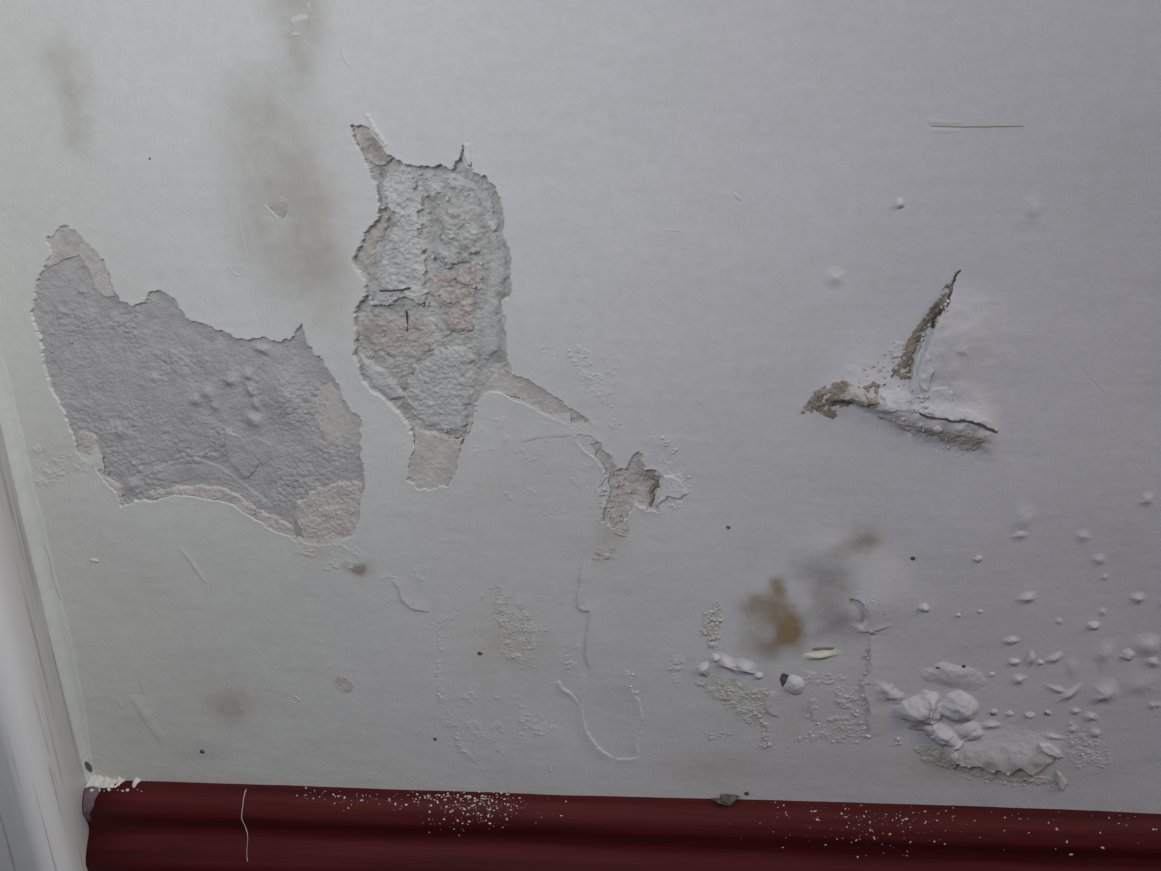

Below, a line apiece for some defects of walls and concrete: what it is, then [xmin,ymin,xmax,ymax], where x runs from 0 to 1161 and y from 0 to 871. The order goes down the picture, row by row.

peeling [21,113,688,554]
leakage [699,600,724,650]
leakage [771,587,800,645]
leakage [694,674,772,749]
leakage [787,670,867,745]